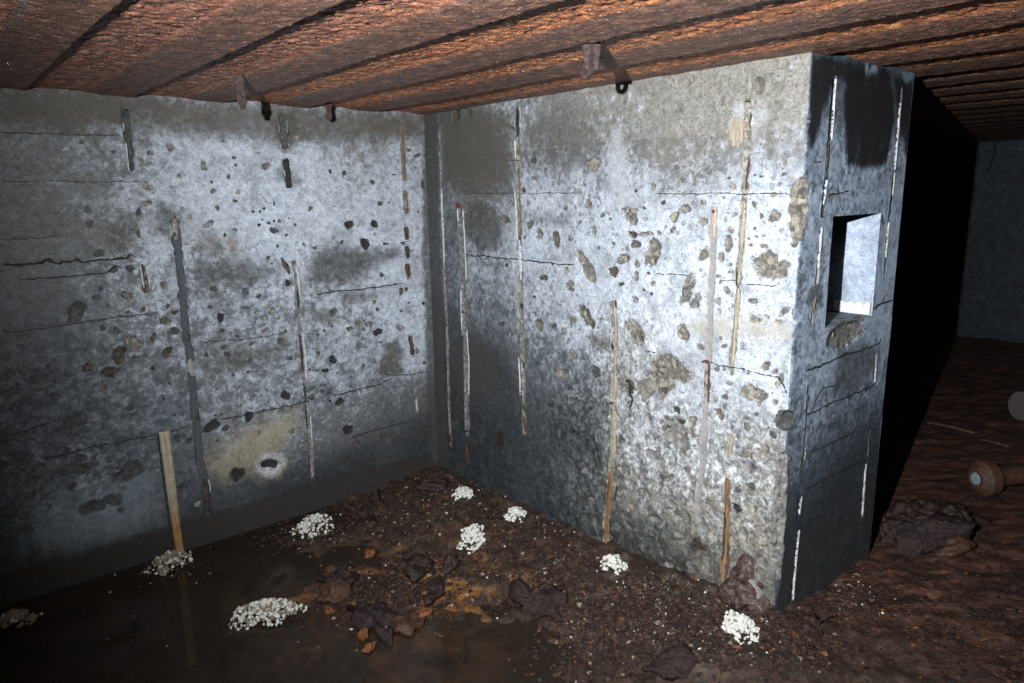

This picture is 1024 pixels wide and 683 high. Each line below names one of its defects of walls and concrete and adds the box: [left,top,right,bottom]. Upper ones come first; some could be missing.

peeling [726,112,751,147]
water stain [807,55,913,168]
crack [2,236,133,280]
crack [465,254,575,265]
crack [656,189,790,197]
spalling [747,160,809,281]
spalling [204,305,254,357]
water stain [0,90,519,605]
spalling [624,318,697,475]
crack [806,339,881,415]